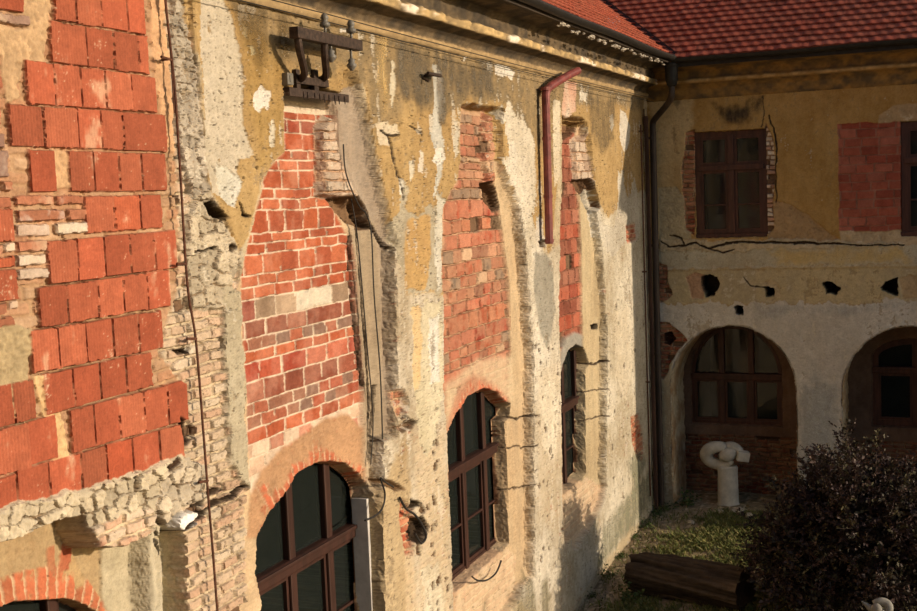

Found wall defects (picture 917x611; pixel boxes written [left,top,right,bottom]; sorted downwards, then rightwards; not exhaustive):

peeling [552,81,588,187]
peeling [609,109,631,153]
flaking render [658,123,904,253]
hole [325,195,369,230]
peeling [570,170,642,257]
crack [661,234,905,253]
flaking render [659,262,673,302]
flaking render [686,272,708,299]
crack [576,358,611,366]
flaking render [660,322,688,379]
crack [491,413,539,421]
flaking render [368,477,523,611]